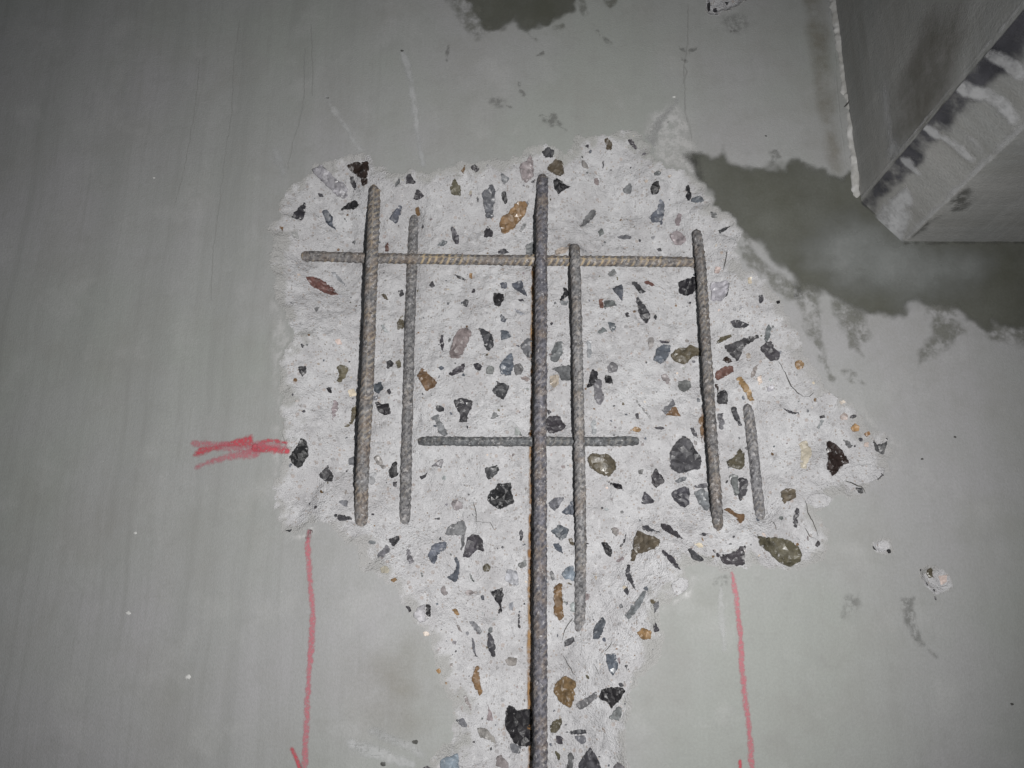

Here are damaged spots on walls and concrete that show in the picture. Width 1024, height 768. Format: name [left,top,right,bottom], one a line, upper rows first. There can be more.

water stain [458,0,575,30]
water stain [889,145,919,174]
water stain [688,153,1024,356]
spalling [267,129,895,768]
spalling [919,564,953,600]